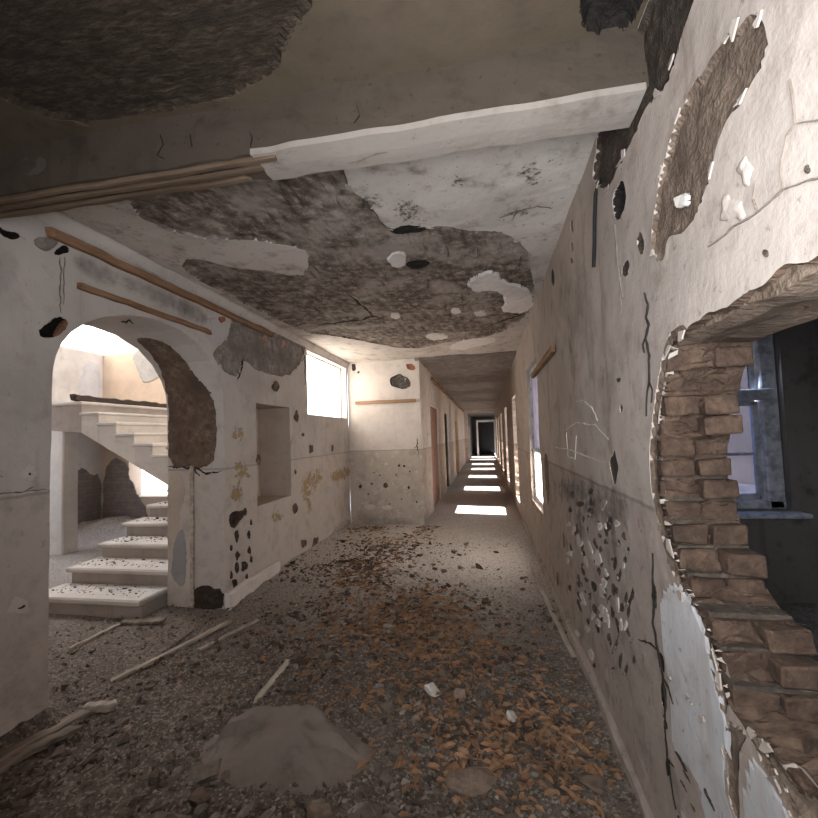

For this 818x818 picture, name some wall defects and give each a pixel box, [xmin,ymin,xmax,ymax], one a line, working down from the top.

spalling [579,0,694,220]
spalling [636,10,768,261]
crack [708,79,818,247]
spalling [129,170,535,348]
crack [642,293,653,416]
flaking render [78,458,148,524]
spalling [137,337,217,586]
spalling [192,585,224,609]
spalling [229,508,253,587]
spalling [556,488,636,676]
crack [638,553,677,810]
spalling [650,325,818,818]